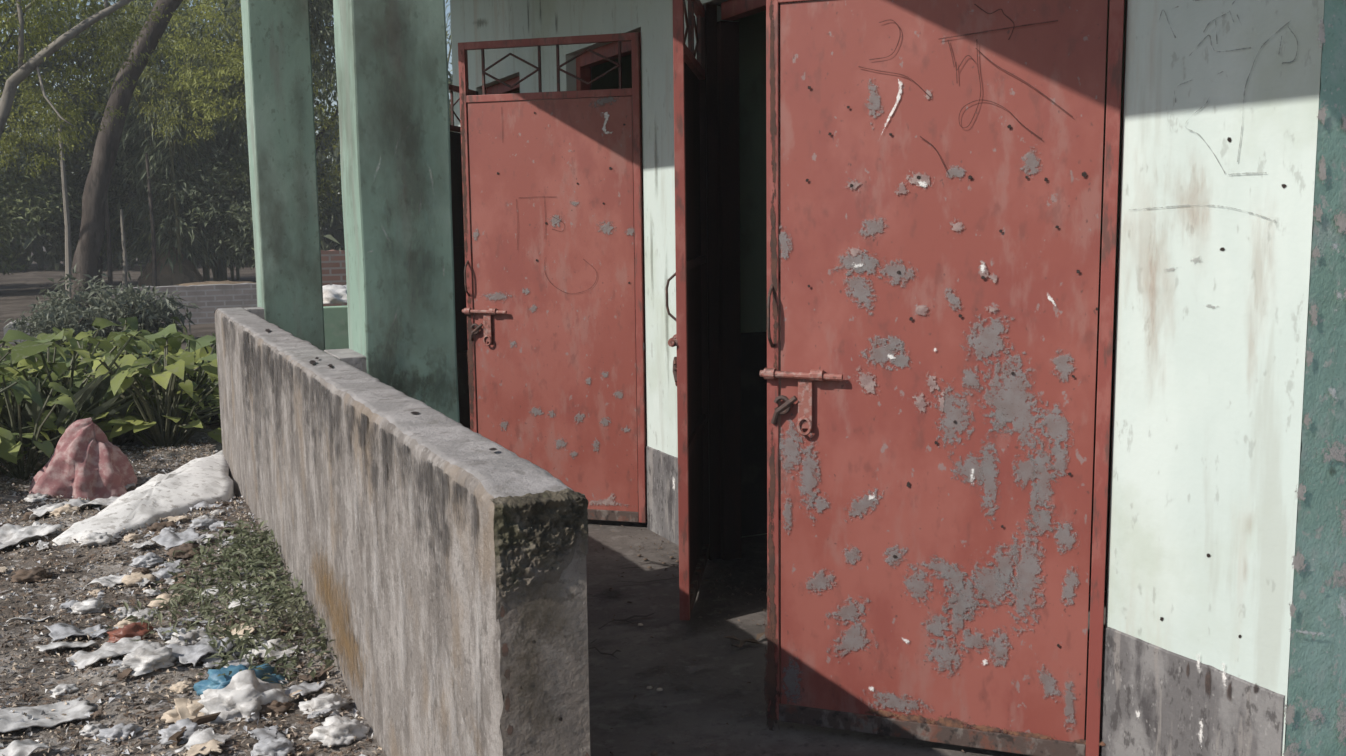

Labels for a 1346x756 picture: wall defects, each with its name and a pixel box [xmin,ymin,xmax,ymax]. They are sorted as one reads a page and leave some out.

peeling [779,225,792,259]
peeling [833,218,914,315]
peeling [895,165,966,195]
spalling [1313,203,1323,222]
peeling [856,335,910,394]
damp [222,317,477,588]
peeling [779,414,829,535]
peeling [845,489,884,522]
peeling [884,306,1080,678]
spalling [1292,549,1306,574]
peeling [825,597,877,663]
peeling [1037,664,1076,730]